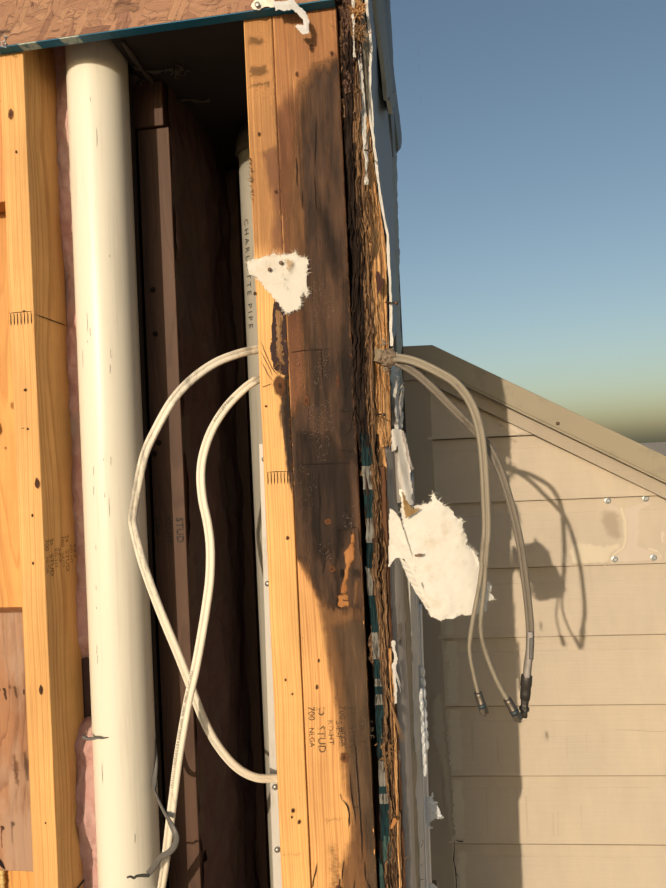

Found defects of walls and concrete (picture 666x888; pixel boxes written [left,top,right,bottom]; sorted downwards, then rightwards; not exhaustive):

water stain [265,7,380,888]